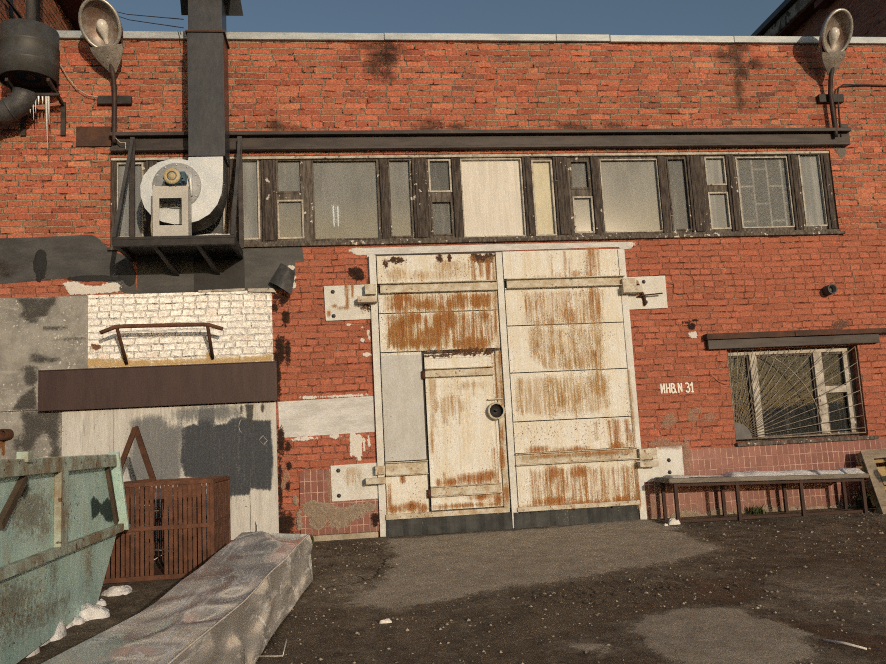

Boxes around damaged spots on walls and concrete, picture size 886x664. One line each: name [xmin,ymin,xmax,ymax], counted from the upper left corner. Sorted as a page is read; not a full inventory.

rust [383,256,407,279]
rust [470,252,496,280]
rust [552,247,600,277]
rust [385,292,504,403]
rust [519,287,610,413]
rust [386,485,427,514]
rust [437,426,509,510]
rust [518,371,641,507]